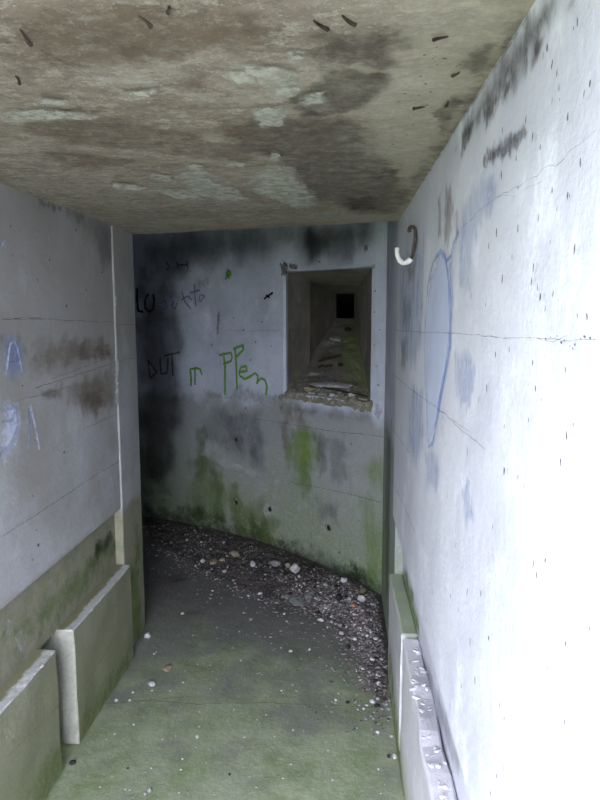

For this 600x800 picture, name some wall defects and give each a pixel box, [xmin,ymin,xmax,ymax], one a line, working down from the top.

damp [48,35,404,214]
damp [451,8,549,150]
damp [483,127,525,165]
damp [143,291,178,481]
spalling [278,379,373,412]